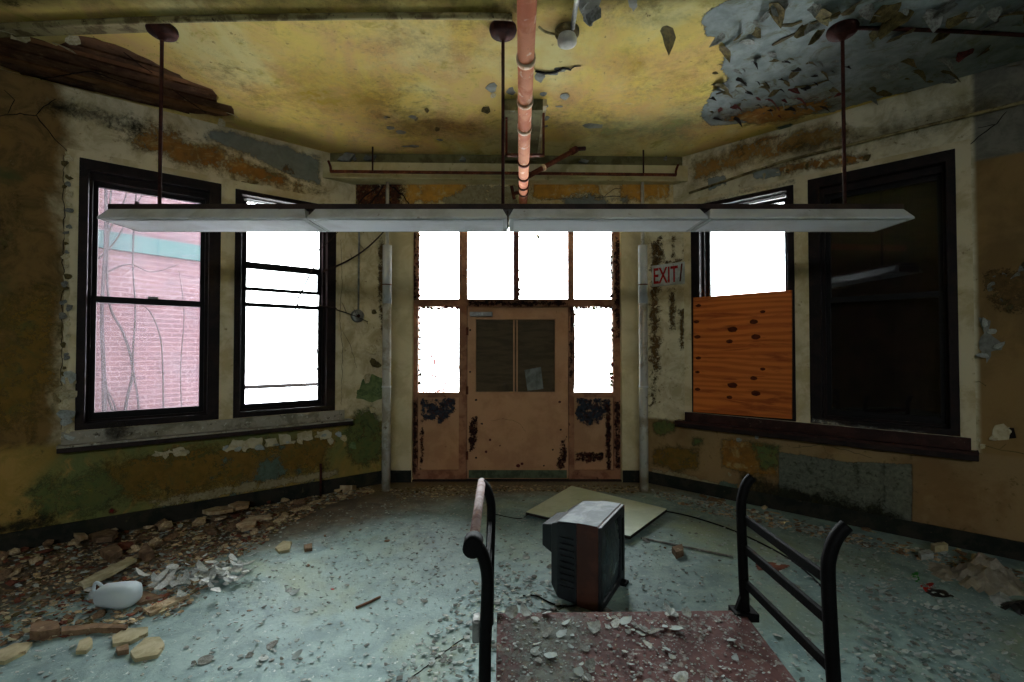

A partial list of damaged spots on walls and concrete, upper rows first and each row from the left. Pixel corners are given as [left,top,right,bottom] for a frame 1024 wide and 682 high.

flaking render [0,30,321,185]
peeling [481,83,516,114]
peeling [535,66,581,127]
peeling [700,0,1024,141]
damp [40,102,319,194]
damp [692,124,847,180]
peeling [975,317,1005,363]
peeling [356,345,382,421]
peeling [151,447,189,459]
damp [104,436,331,507]
peeling [222,430,356,452]
flaking render [973,424,1016,449]